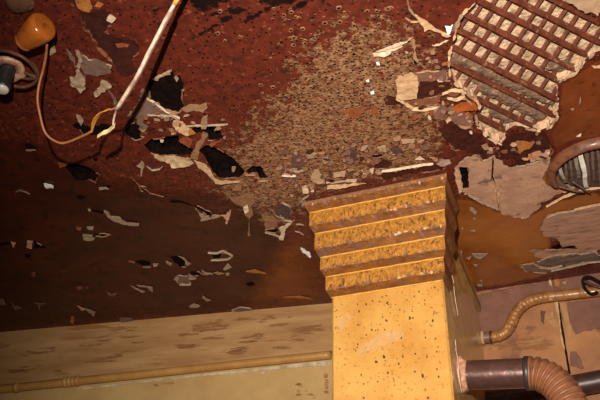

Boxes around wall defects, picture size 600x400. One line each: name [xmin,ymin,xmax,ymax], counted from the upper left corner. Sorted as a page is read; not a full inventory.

peeling [66,0,140,106]
peeling [72,114,112,135]
spalling [58,162,111,190]
flaking render [124,0,600,334]
crack [491,158,500,210]
peeling [88,209,139,226]
peeling [76,226,111,241]
peeling [25,240,47,258]
crack [554,301,572,374]